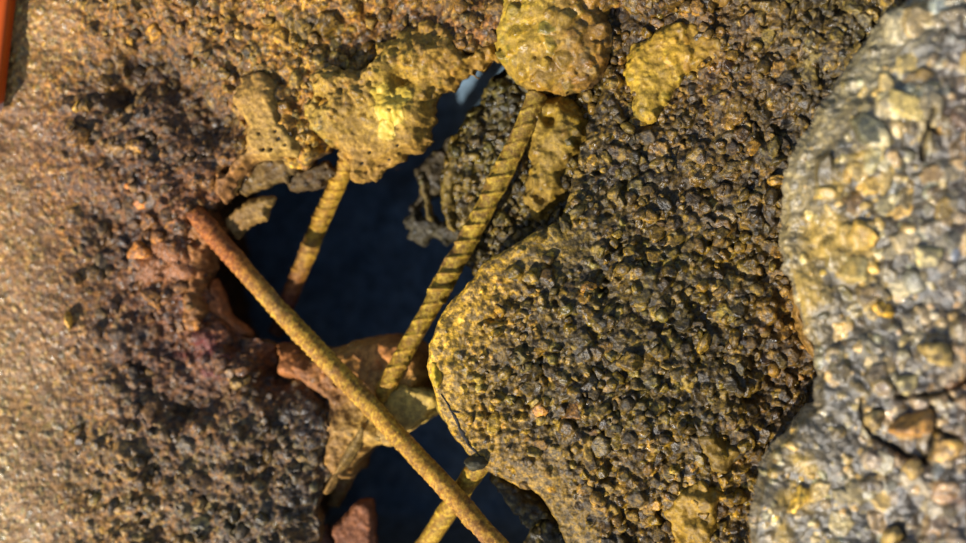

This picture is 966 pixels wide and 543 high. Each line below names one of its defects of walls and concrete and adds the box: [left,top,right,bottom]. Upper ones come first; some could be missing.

rust [140,226,220,357]
spalling [30,0,504,543]